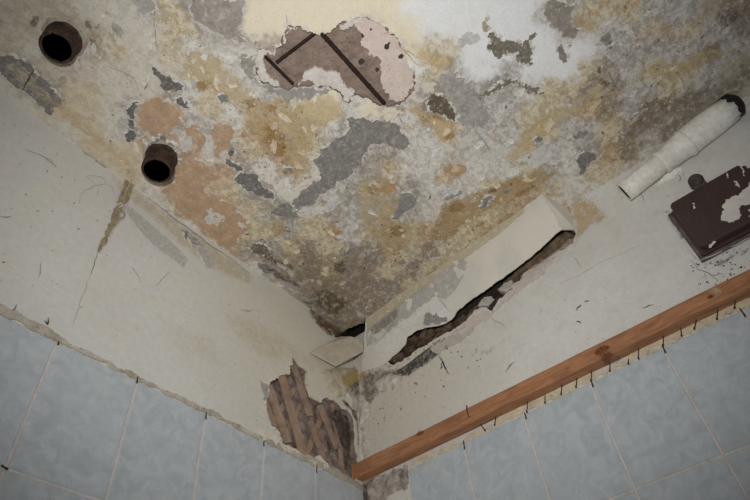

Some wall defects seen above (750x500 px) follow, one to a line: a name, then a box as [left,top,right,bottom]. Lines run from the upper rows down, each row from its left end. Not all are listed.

peeling [0,52,80,118]
leakage [187,52,340,178]
leakage [627,46,725,136]
spalling [84,0,750,367]
leakage [261,245,366,337]
leakage [342,338,462,403]
crack [396,339,449,376]